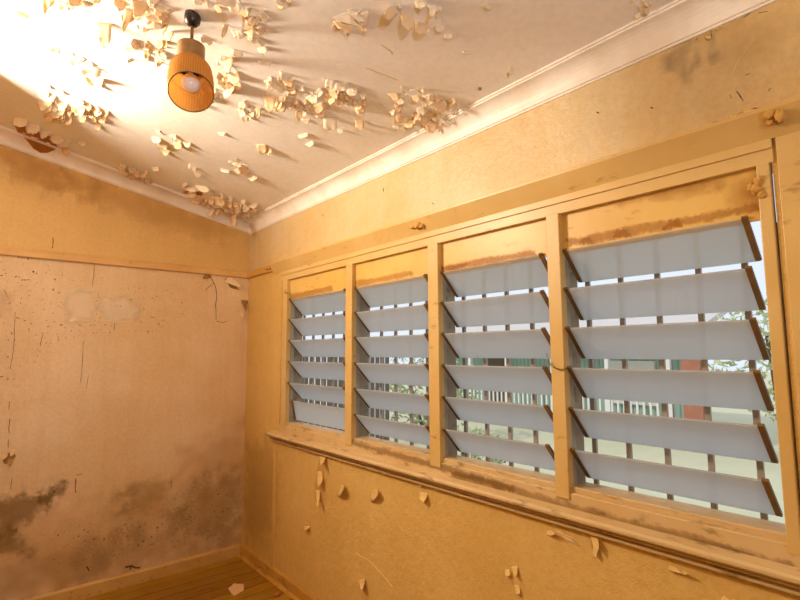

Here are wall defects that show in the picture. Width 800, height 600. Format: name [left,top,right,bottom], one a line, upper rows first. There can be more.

peeling [41,0,101,15]
peeling [95,22,112,49]
peeling [113,0,174,67]
peeling [193,0,272,66]
peeling [332,8,368,37]
peeling [384,0,454,39]
peeling [13,45,109,155]
peeling [204,49,367,147]
peeling [388,86,459,133]
peeling [152,130,191,156]
peeling [220,158,257,181]
peeling [181,164,259,226]